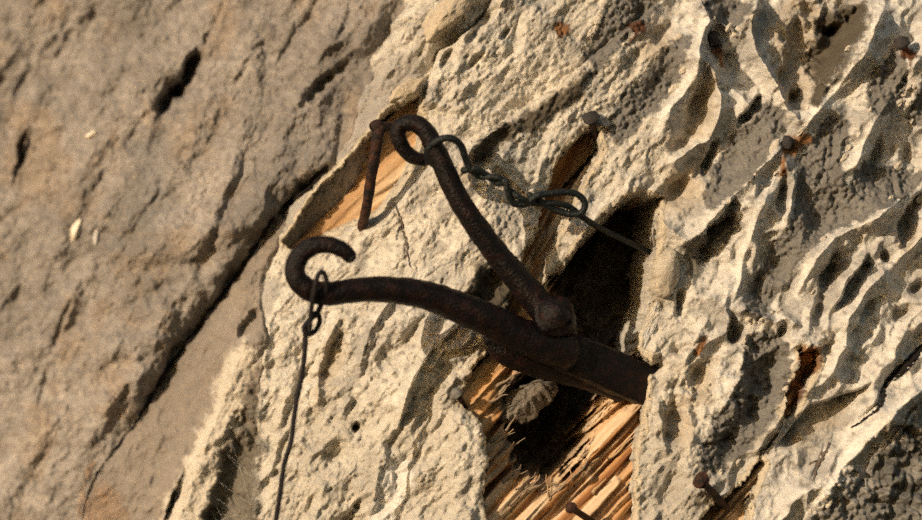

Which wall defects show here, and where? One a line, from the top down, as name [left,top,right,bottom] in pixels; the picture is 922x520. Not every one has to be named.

corrosion [554,21,569,37]
flaking render [279,91,428,253]
flaking render [520,0,757,262]
corrosion [779,134,812,176]
flaking render [544,187,668,282]
flaking render [453,345,489,520]
flaking render [631,296,663,520]
corrosion [789,345,822,410]
crack [808,442,830,480]
crack [851,344,922,428]
crack [880,402,922,452]